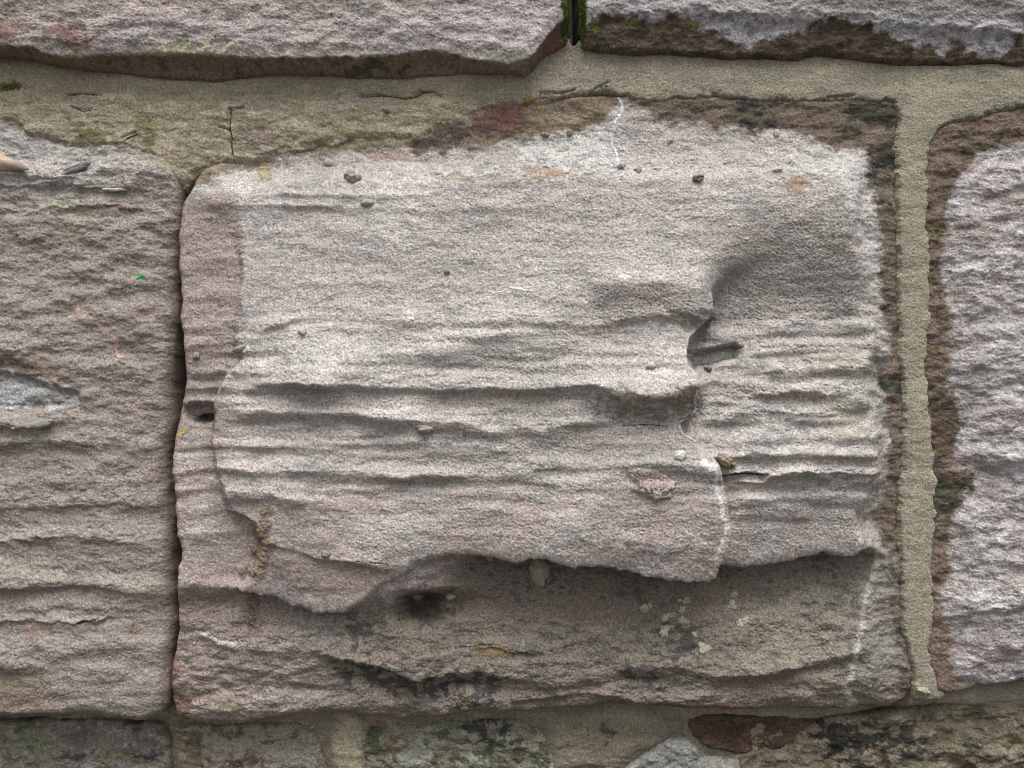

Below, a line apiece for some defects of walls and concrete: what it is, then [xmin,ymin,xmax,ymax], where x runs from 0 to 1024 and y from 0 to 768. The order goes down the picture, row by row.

spalling [401,584,452,627]